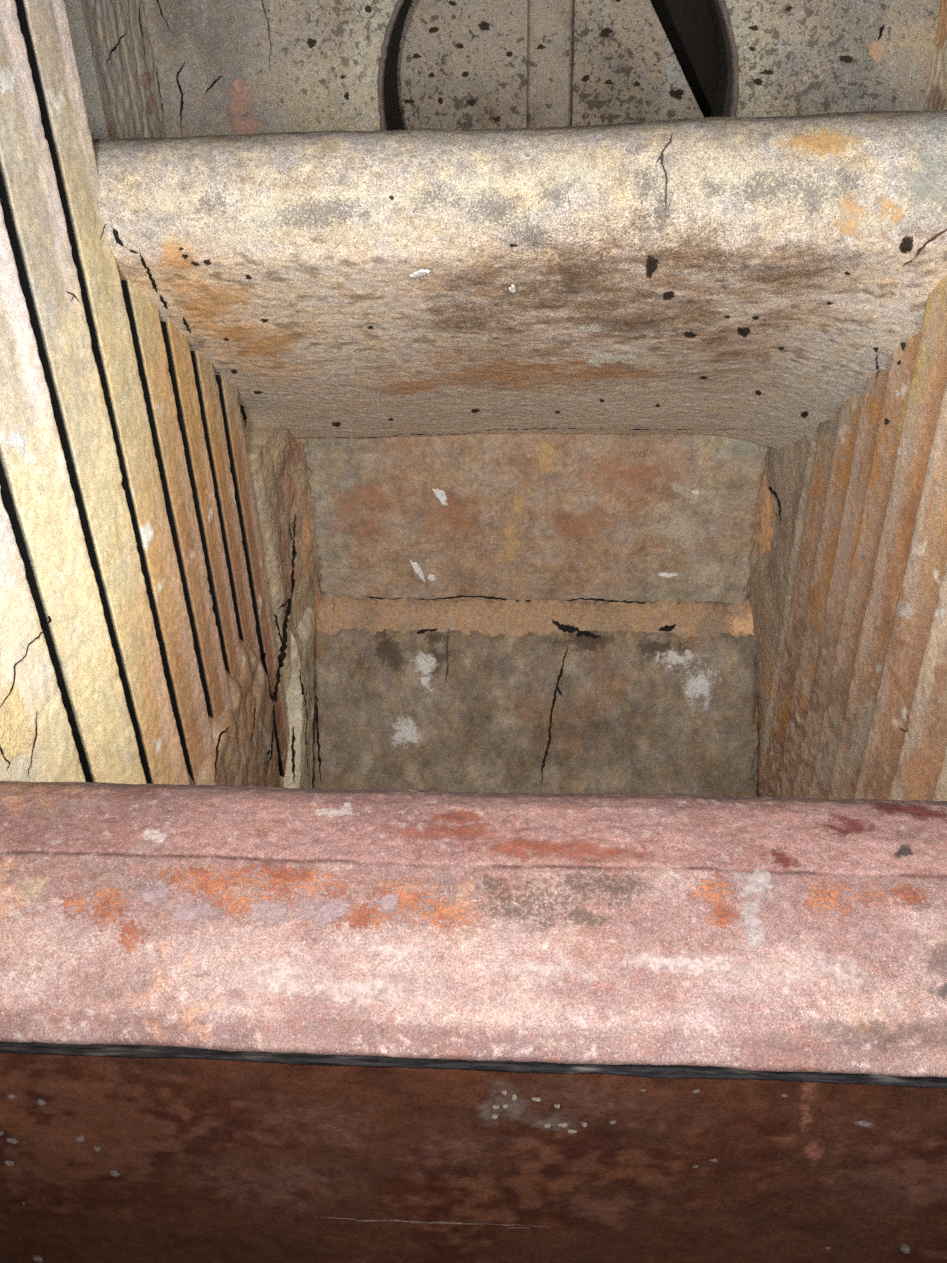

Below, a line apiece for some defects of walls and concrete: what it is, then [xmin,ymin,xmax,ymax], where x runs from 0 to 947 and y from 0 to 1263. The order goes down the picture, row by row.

crack [105,0,222,130]
crack [656,133,673,216]
crack [0,615,51,706]
efflorescence [416,653,438,691]
crack [365,595,723,785]
efflorescence [656,650,716,711]
crack [0,714,37,778]
efflorescence [393,716,420,744]
corrosion [876,803,947,818]
corrosion [61,878,145,954]
corrosion [148,862,481,933]
corrosion [806,878,930,920]